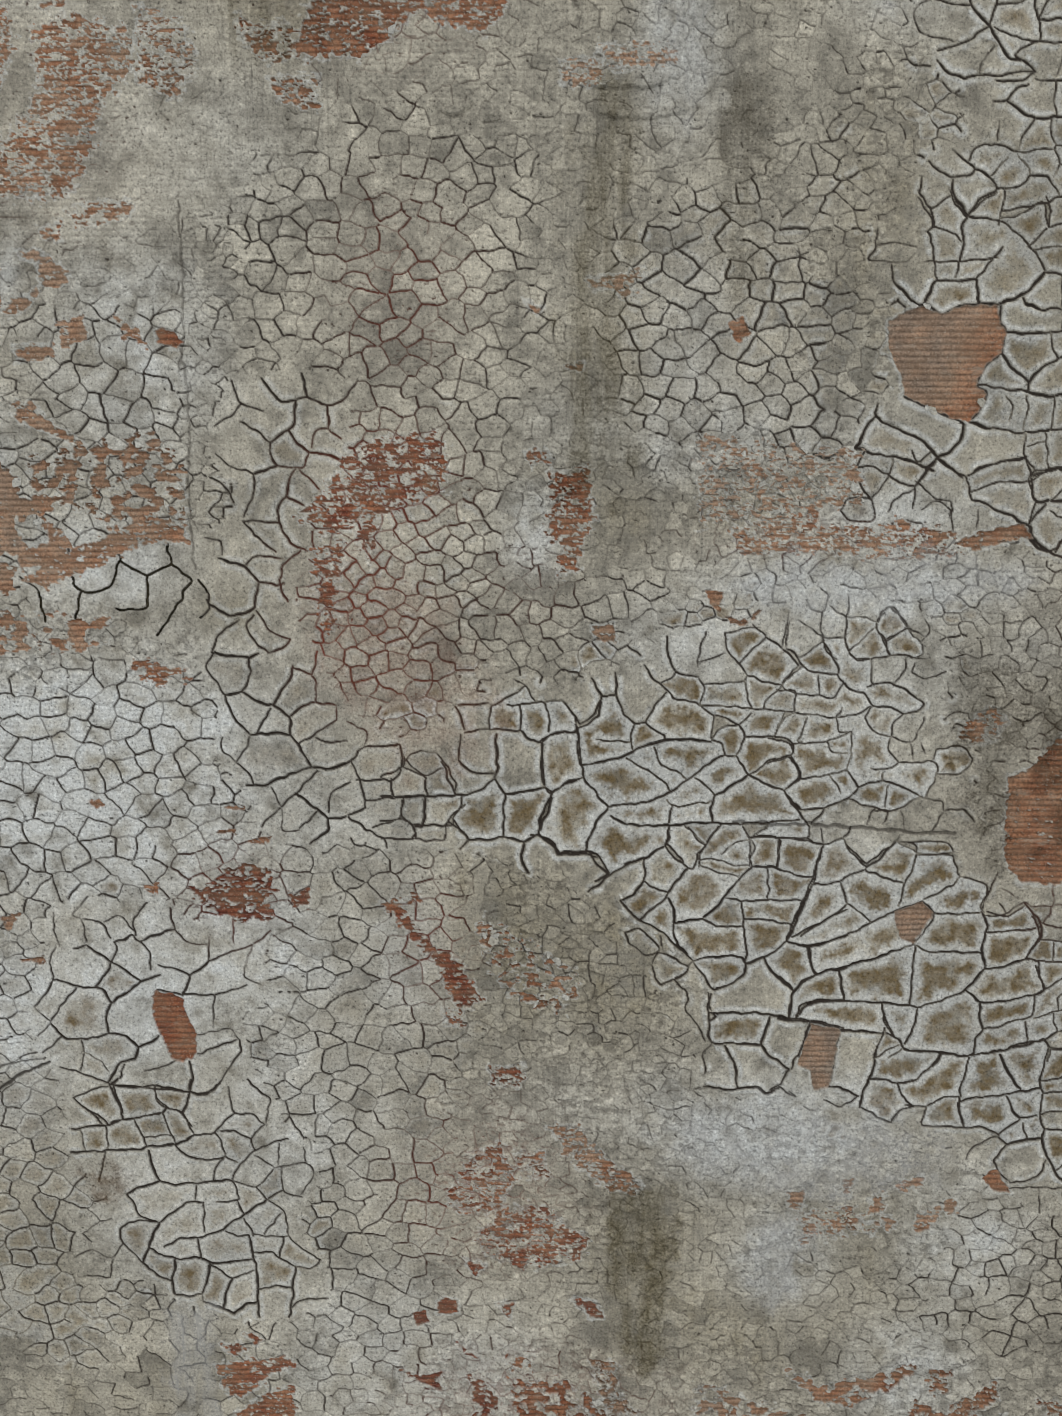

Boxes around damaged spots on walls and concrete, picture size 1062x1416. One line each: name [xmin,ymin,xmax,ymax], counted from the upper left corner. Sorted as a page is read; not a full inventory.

peeling [0,0,197,315]
crack [29,199,264,570]
peeling [234,0,506,110]
crack [595,0,1062,558]
peeling [888,302,1007,425]
crack [12,598,68,641]
peeling [0,401,191,655]
peeling [293,431,447,636]
crack [204,107,1062,1381]
peeling [1004,738,1062,885]
peeling [152,990,197,1062]
crack [0,619,519,1391]